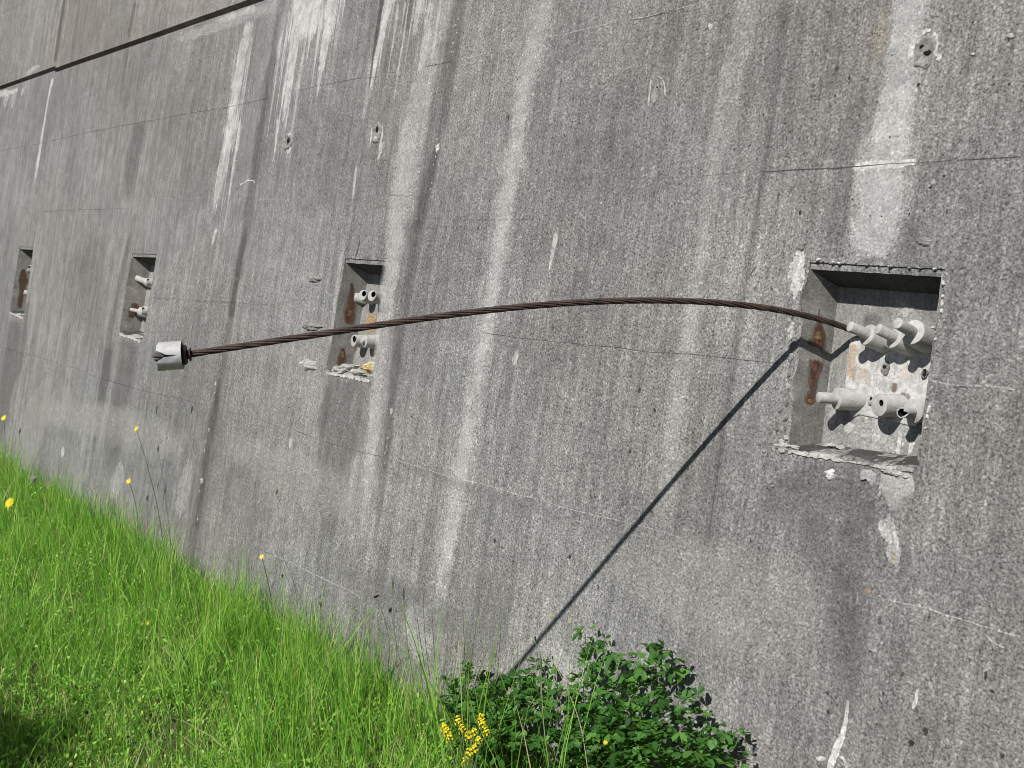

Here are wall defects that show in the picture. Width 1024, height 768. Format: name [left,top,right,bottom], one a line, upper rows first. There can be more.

damp [181,0,344,158]
damp [216,154,226,196]
rust [17,269,28,308]
rust [343,283,376,333]
rust [804,308,825,405]